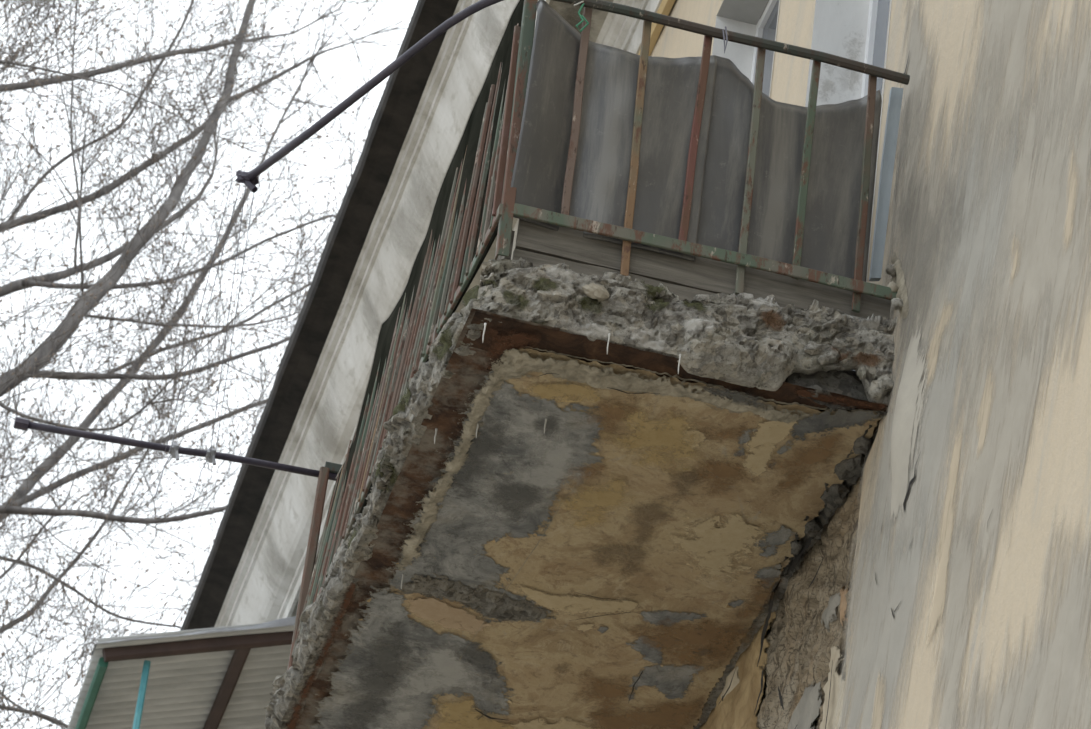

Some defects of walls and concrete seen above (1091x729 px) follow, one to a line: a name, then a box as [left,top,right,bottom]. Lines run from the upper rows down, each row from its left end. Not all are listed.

rust [482,329,538,371]
water stain [455,408,585,519]
spalling [265,251,909,729]
crack [881,452,921,534]
crack [718,537,825,729]